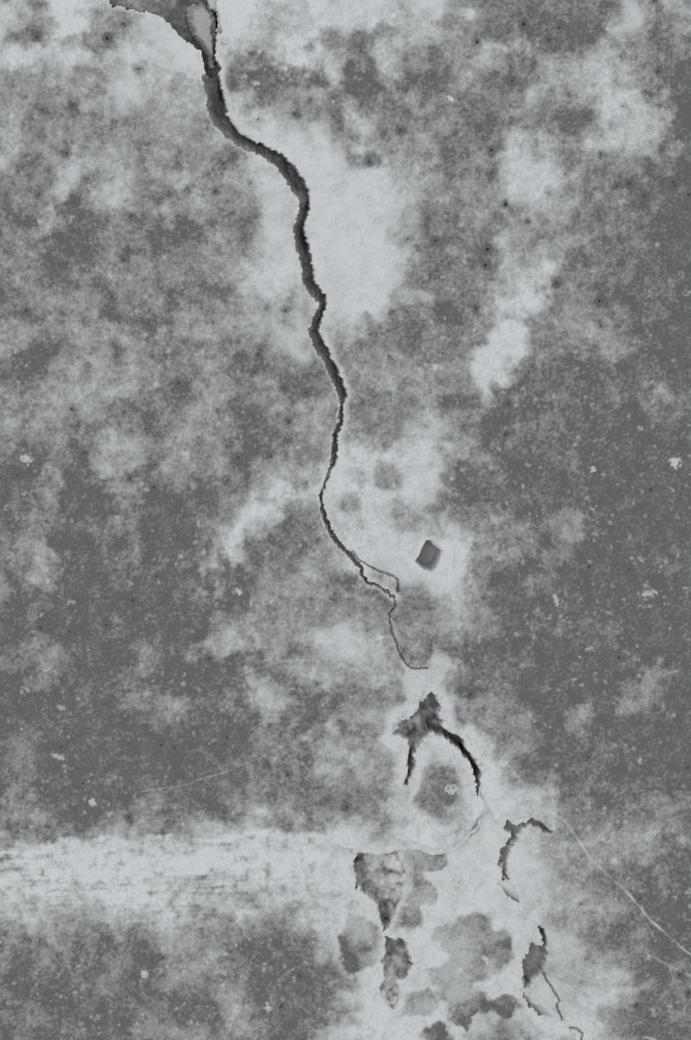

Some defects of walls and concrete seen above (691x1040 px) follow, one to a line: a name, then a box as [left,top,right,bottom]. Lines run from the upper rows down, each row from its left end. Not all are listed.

crack [201,72,554,903]
spalling [362,442,457,596]
spalling [323,648,649,1040]
crack [521,926,584,1040]